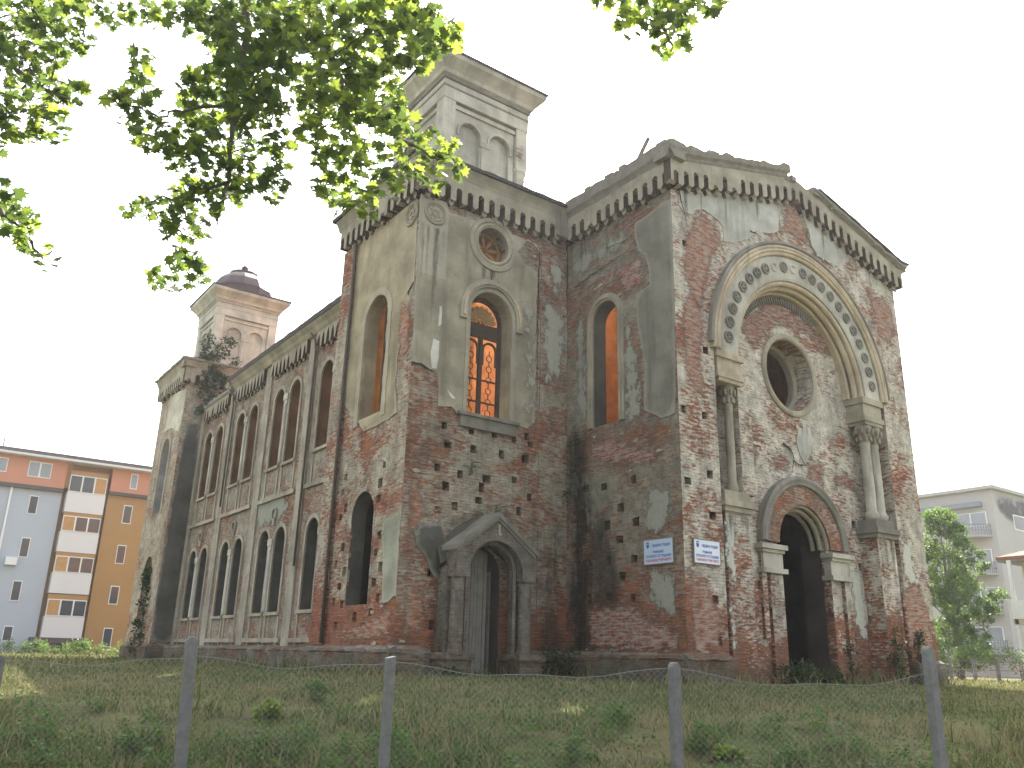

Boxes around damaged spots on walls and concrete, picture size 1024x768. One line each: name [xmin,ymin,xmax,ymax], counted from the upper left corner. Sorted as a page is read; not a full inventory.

peeling [524,263,587,426]
spalling [590,310,663,472]
spalling [677,214,728,401]
spalling [739,304,833,363]
spalling [870,292,896,346]
spalling [334,468,483,646]
damp [573,435,588,649]
peeling [643,489,672,536]
spalling [585,557,737,654]
peeling [724,516,737,585]
peeling [849,564,868,640]
spalling [900,539,934,654]